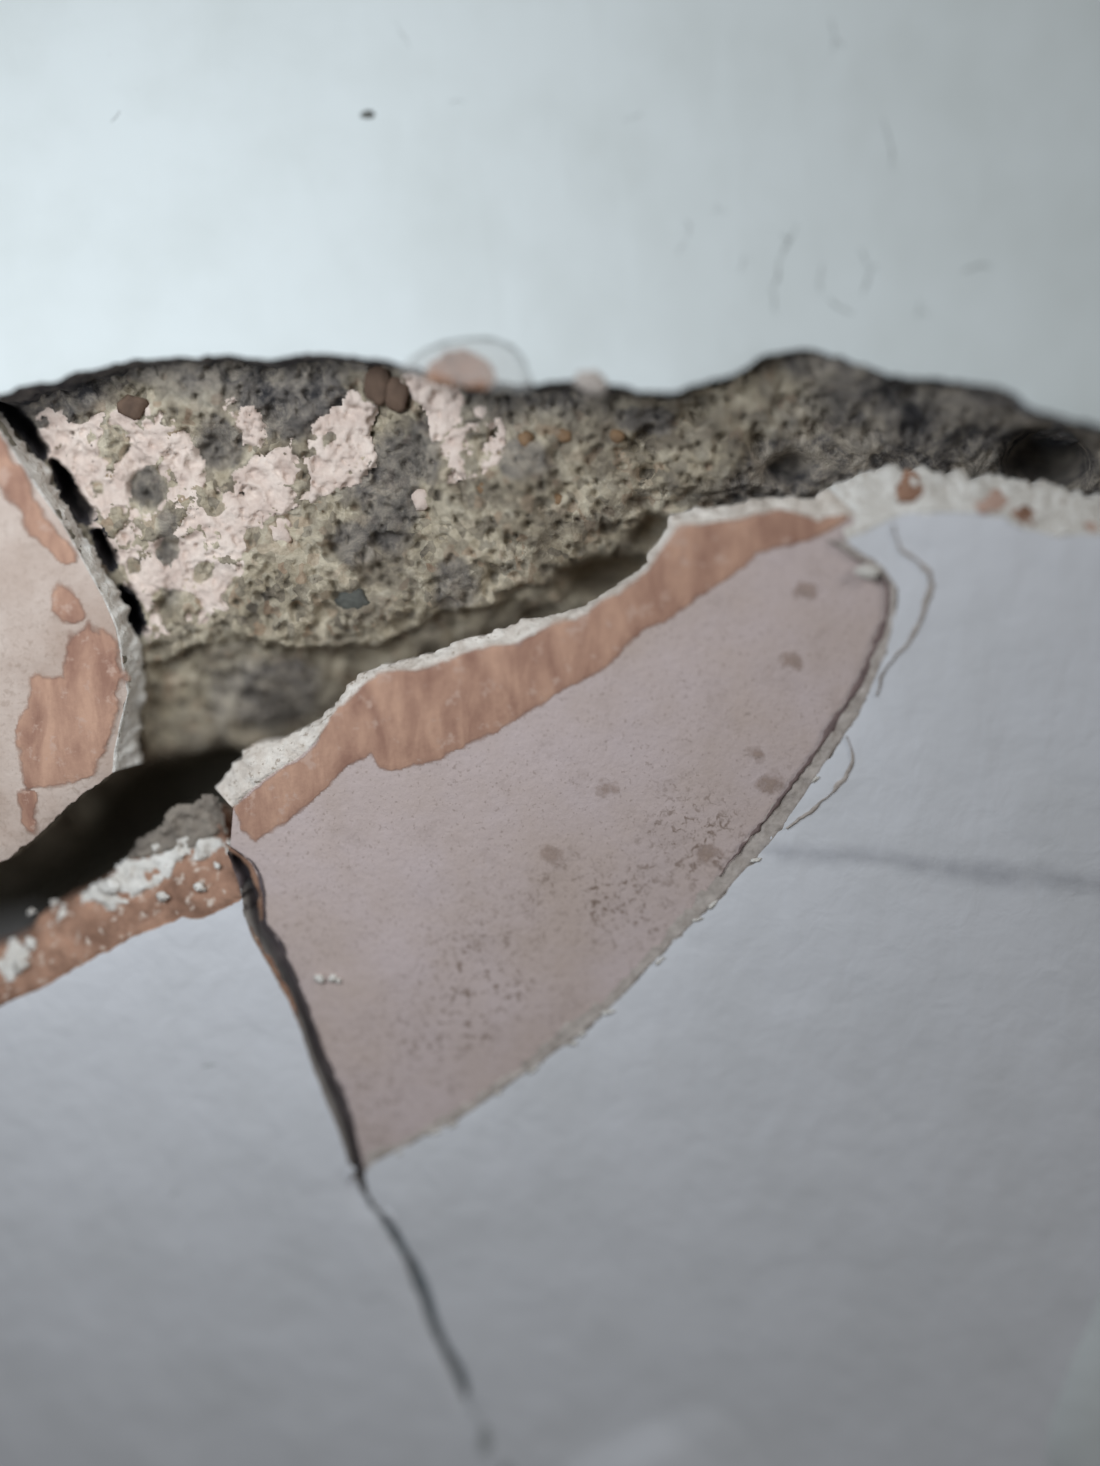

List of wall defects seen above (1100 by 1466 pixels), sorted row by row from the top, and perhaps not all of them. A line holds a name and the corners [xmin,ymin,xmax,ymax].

crack [0,741,468,1394]
peeling [0,336,1100,1173]